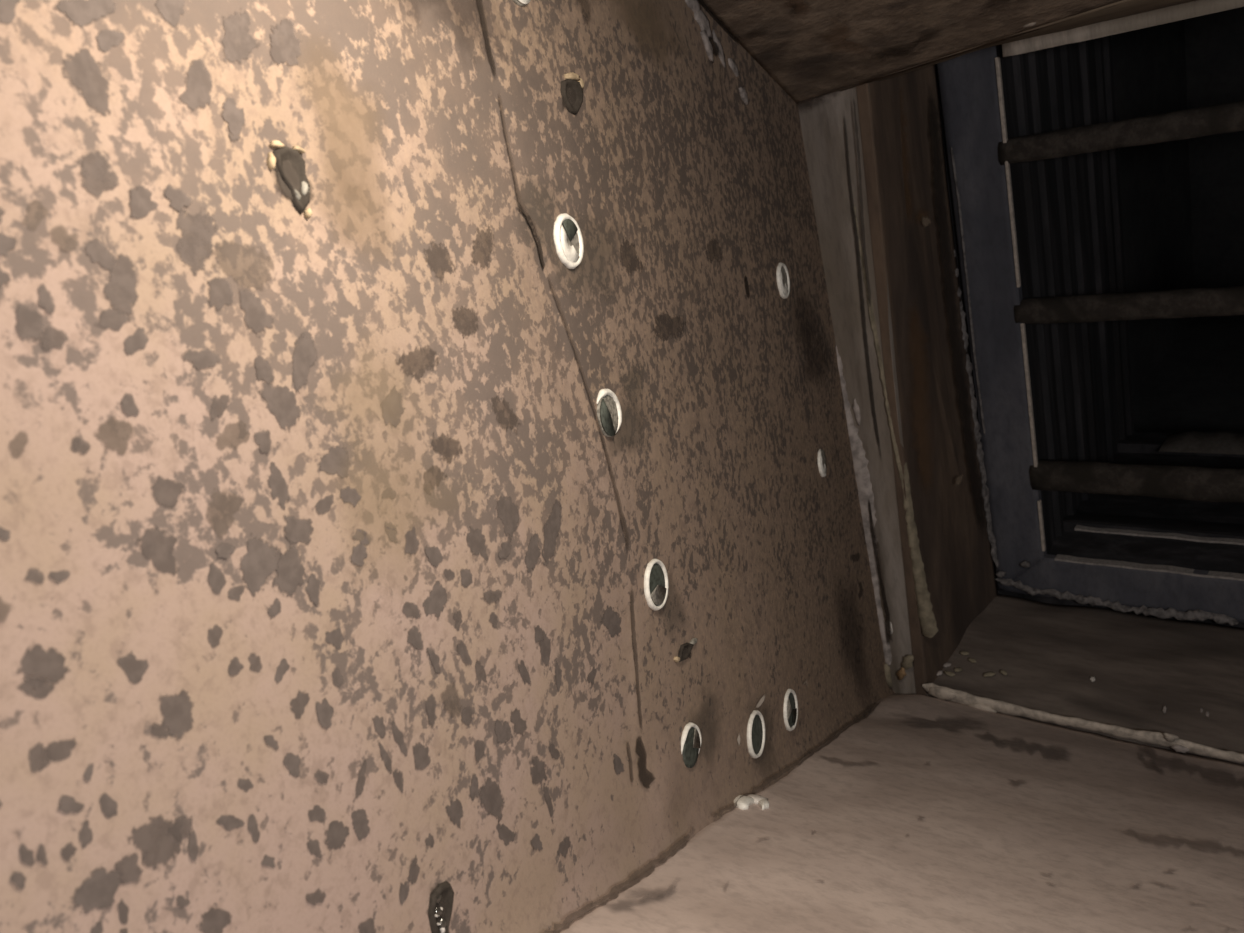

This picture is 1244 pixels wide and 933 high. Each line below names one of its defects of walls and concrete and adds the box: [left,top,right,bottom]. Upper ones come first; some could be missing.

water stain [54,0,125,116]
water stain [180,59,245,141]
water stain [16,201,149,355]
water stain [78,150,274,337]
crack [477,0,629,546]
water stain [71,393,139,455]
water stain [207,332,361,618]
water stain [384,496,519,728]
crack [631,590,642,727]
water stain [71,815,199,933]
water stain [307,760,370,858]
water stain [446,708,527,846]